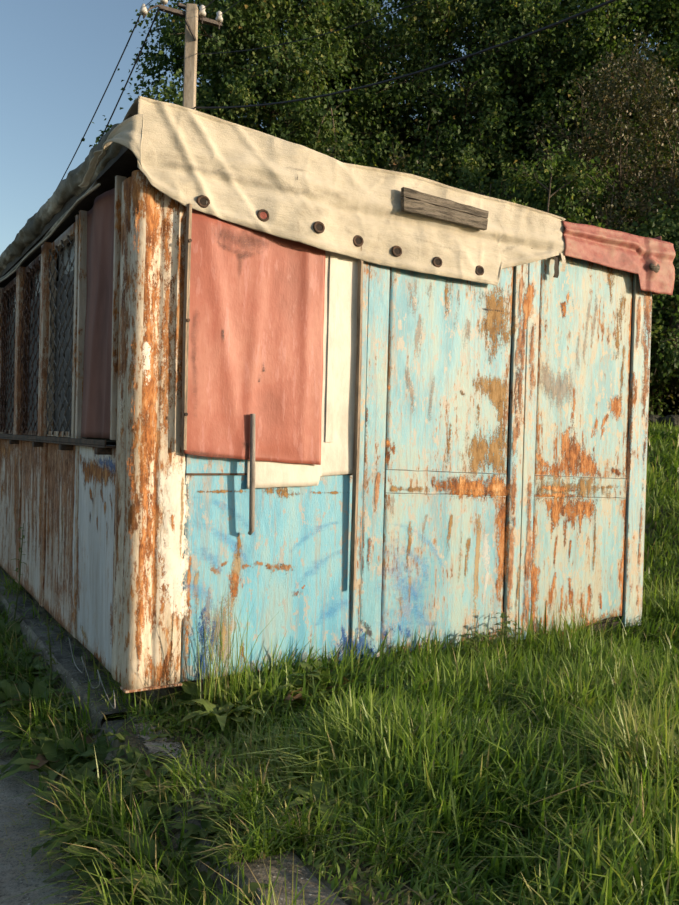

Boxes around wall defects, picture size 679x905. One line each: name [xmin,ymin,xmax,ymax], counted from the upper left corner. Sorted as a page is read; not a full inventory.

corrosion [0,184,192,686]
corrosion [264,487,350,498]
corrosion [358,278,652,634]
peeling [539,362,576,407]
peeling [576,303,598,365]
peeling [606,267,626,400]
corrosion [220,534,243,656]